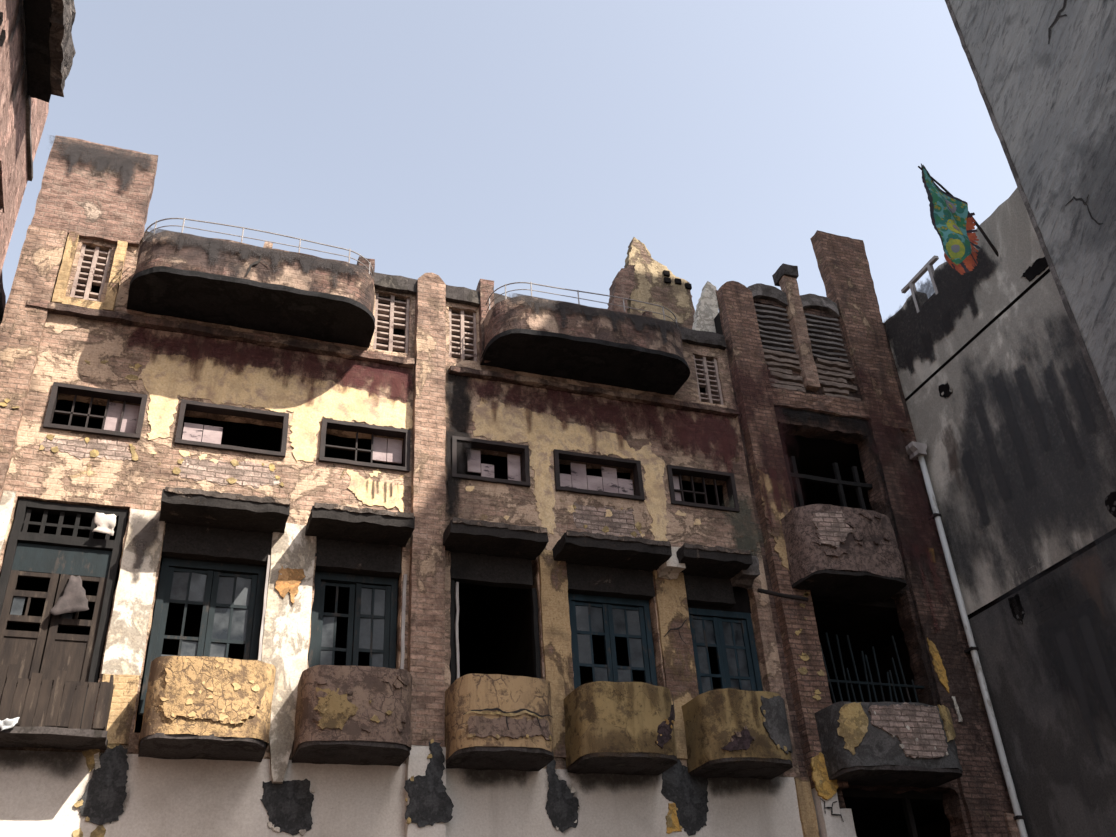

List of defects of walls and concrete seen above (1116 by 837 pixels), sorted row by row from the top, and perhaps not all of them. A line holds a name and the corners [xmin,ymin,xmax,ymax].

leakage [884,248,996,374]
leakage [128,327,414,403]
leakage [470,365,796,526]
flaking render [757,469,793,577]
leakage [899,317,1116,763]
flaking render [159,659,266,726]
flaking render [837,637,963,759]
spalling [72,744,129,837]
spalling [260,779,315,836]
spalling [404,739,454,827]
spalling [545,760,580,833]
spalling [661,759,709,836]